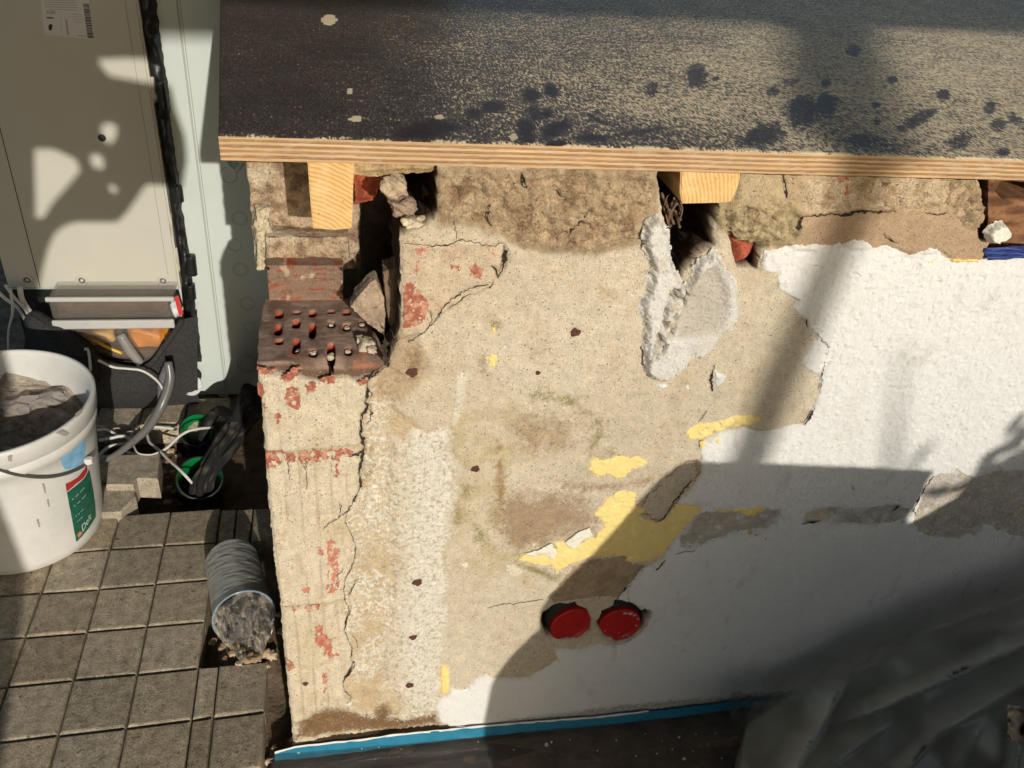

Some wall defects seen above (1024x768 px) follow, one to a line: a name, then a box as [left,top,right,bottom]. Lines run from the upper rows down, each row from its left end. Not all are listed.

flaking render [444,174,654,253]
flaking render [723,204,792,261]
flaking render [713,368,726,387]
crack [324,200,519,704]
peeling [506,414,780,603]
flaking render [827,470,1024,539]
peeling [439,665,450,695]